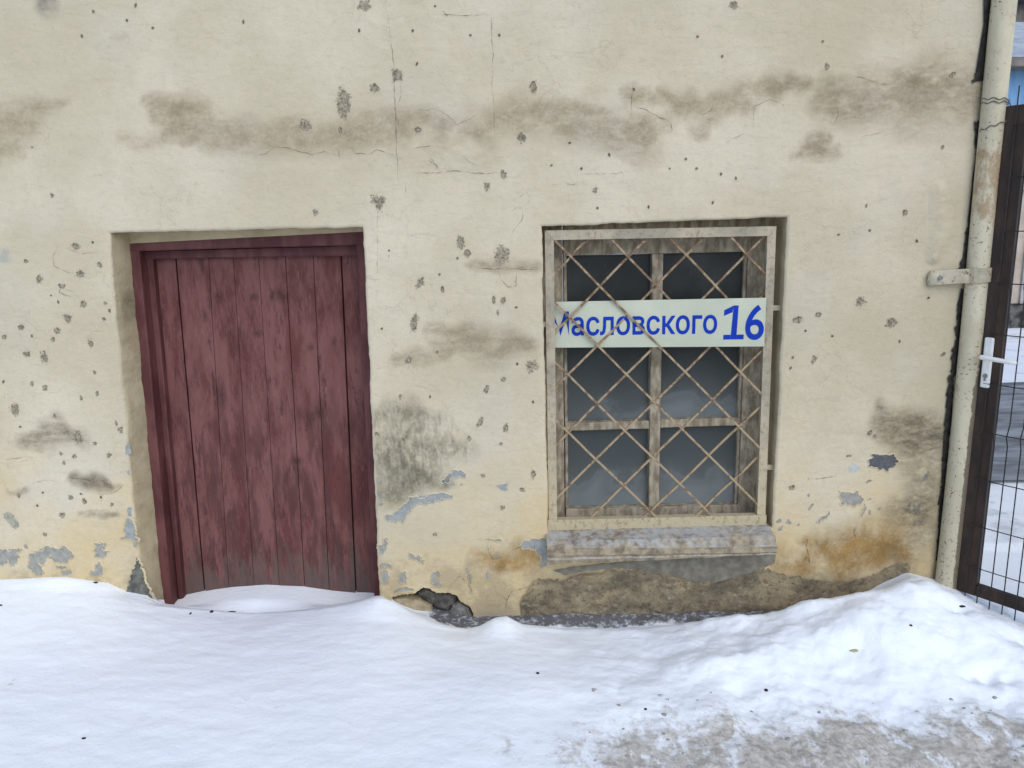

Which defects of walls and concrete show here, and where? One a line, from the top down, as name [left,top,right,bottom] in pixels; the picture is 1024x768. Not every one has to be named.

peeling [377,468,467,525]
peeling [807,452,900,524]
peeling [0,533,76,576]
spalling [376,536,490,617]
flaking render [489,536,910,616]
rust [799,534,908,574]